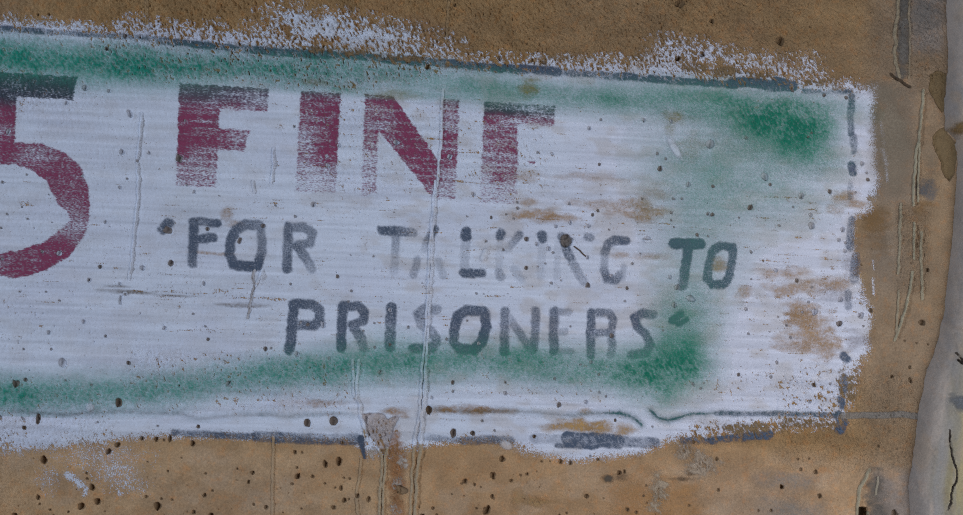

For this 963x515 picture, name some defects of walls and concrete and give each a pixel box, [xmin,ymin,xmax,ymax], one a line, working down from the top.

crack [890,73,911,88]
spalling [362,413,398,450]